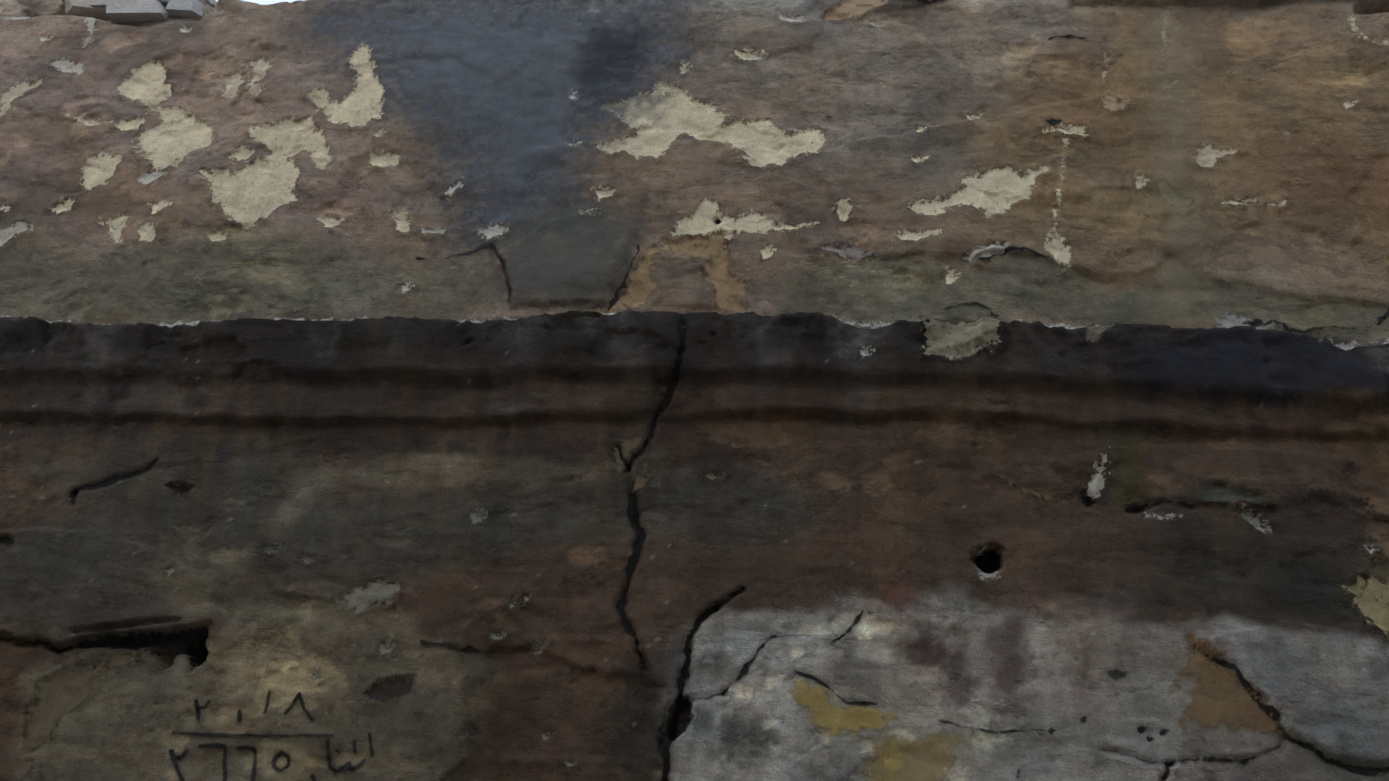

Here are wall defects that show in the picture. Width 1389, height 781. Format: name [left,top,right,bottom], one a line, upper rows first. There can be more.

peeling [50,56,215,215]
peeling [199,43,401,242]
peeling [564,59,826,168]
crack [416,242,511,302]
spalling [605,198,819,315]
peeling [894,165,1052,241]
crack [69,458,194,505]
crack [616,313,685,664]
crack [0,626,209,671]
crack [659,588,863,781]
crack [1115,744,1281,781]
spalling [1137,632,1389,776]